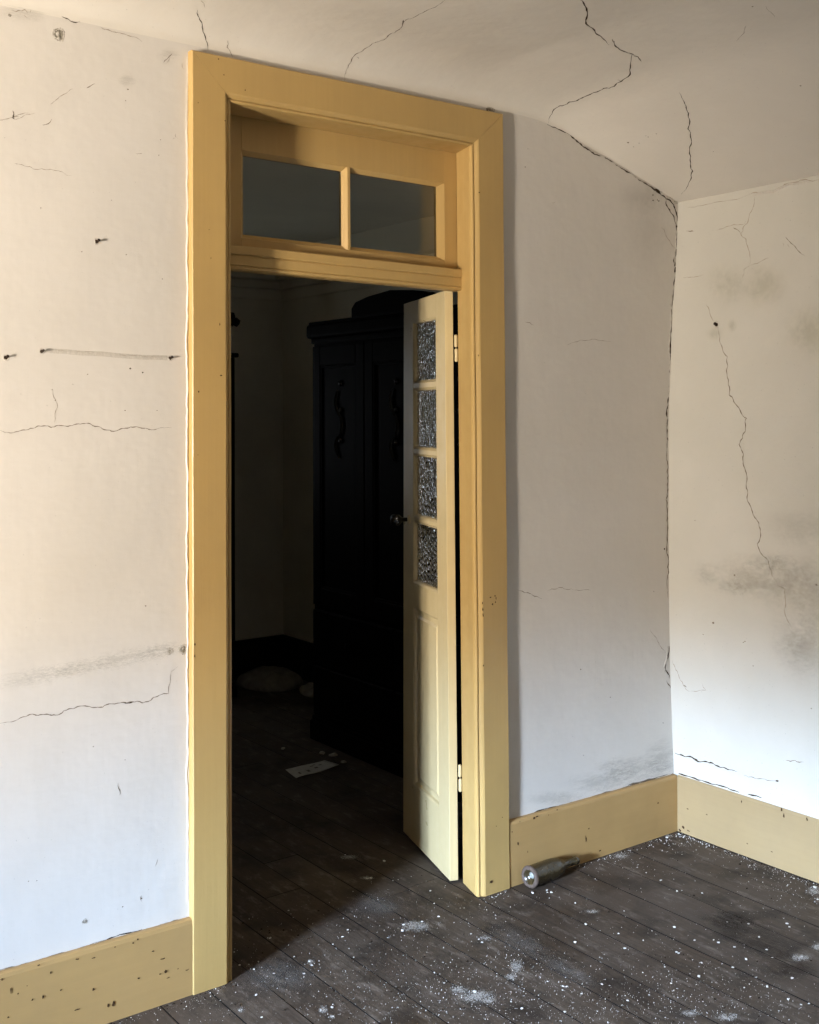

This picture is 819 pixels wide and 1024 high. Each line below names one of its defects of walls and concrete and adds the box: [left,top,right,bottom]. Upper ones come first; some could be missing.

crack [547,0,693,595]
crack [0,395,170,433]
crack [706,305,791,626]
crack [4,667,177,723]
crack [675,753,800,782]